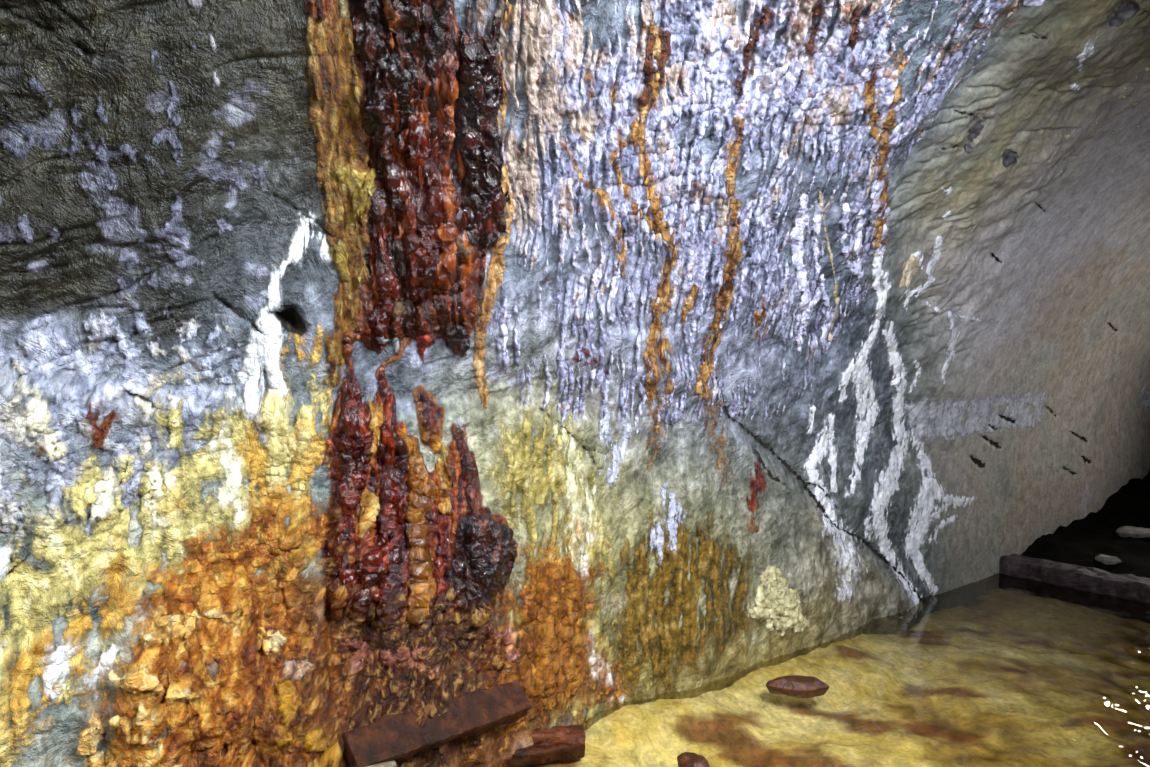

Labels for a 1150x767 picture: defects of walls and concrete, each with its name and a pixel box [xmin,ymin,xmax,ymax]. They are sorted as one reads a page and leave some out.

leakage [2,104,149,184]
leakage [152,81,183,160]
corrosion [560,23,699,469]
corrosion [694,115,745,483]
corrosion [734,4,775,100]
leakage [476,0,1045,729]
corrosion [806,0,830,57]
corrosion [845,4,909,249]
leakage [1070,43,1094,90]
leakage [0,196,333,767]
crack [715,376,925,602]
corrosion [504,562,603,714]